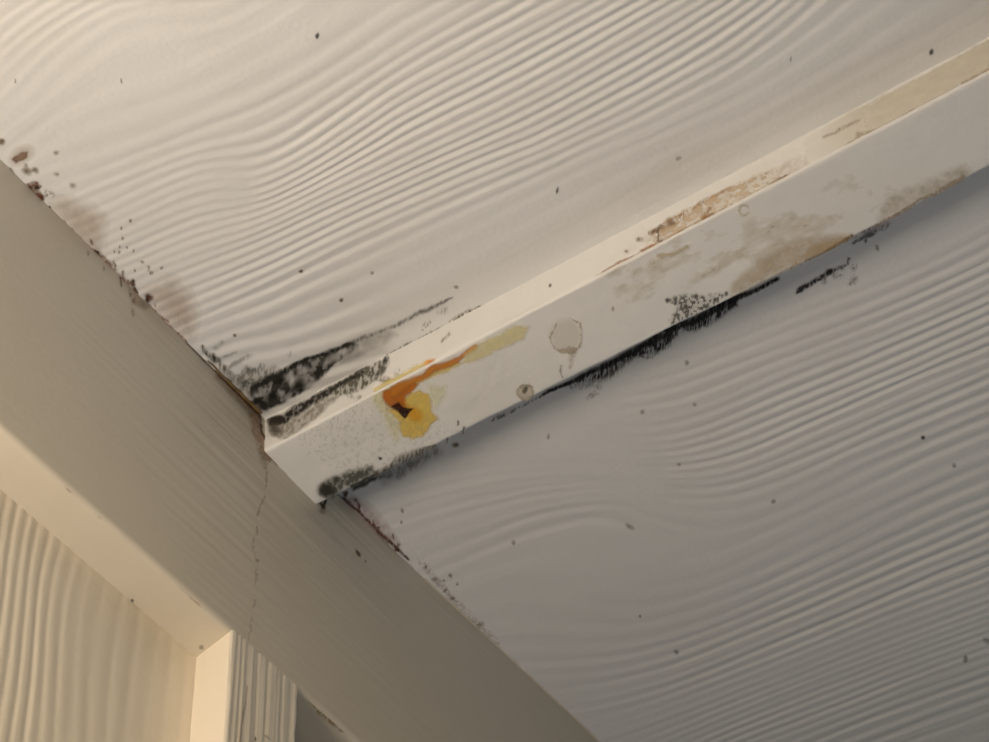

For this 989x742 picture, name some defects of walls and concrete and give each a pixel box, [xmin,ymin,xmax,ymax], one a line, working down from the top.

water stain [71,219,187,342]
water stain [796,258,850,294]
water stain [791,175,965,270]
water stain [202,330,389,437]
corrosion [374,329,519,439]
water stain [492,277,779,421]
mould [319,438,448,510]